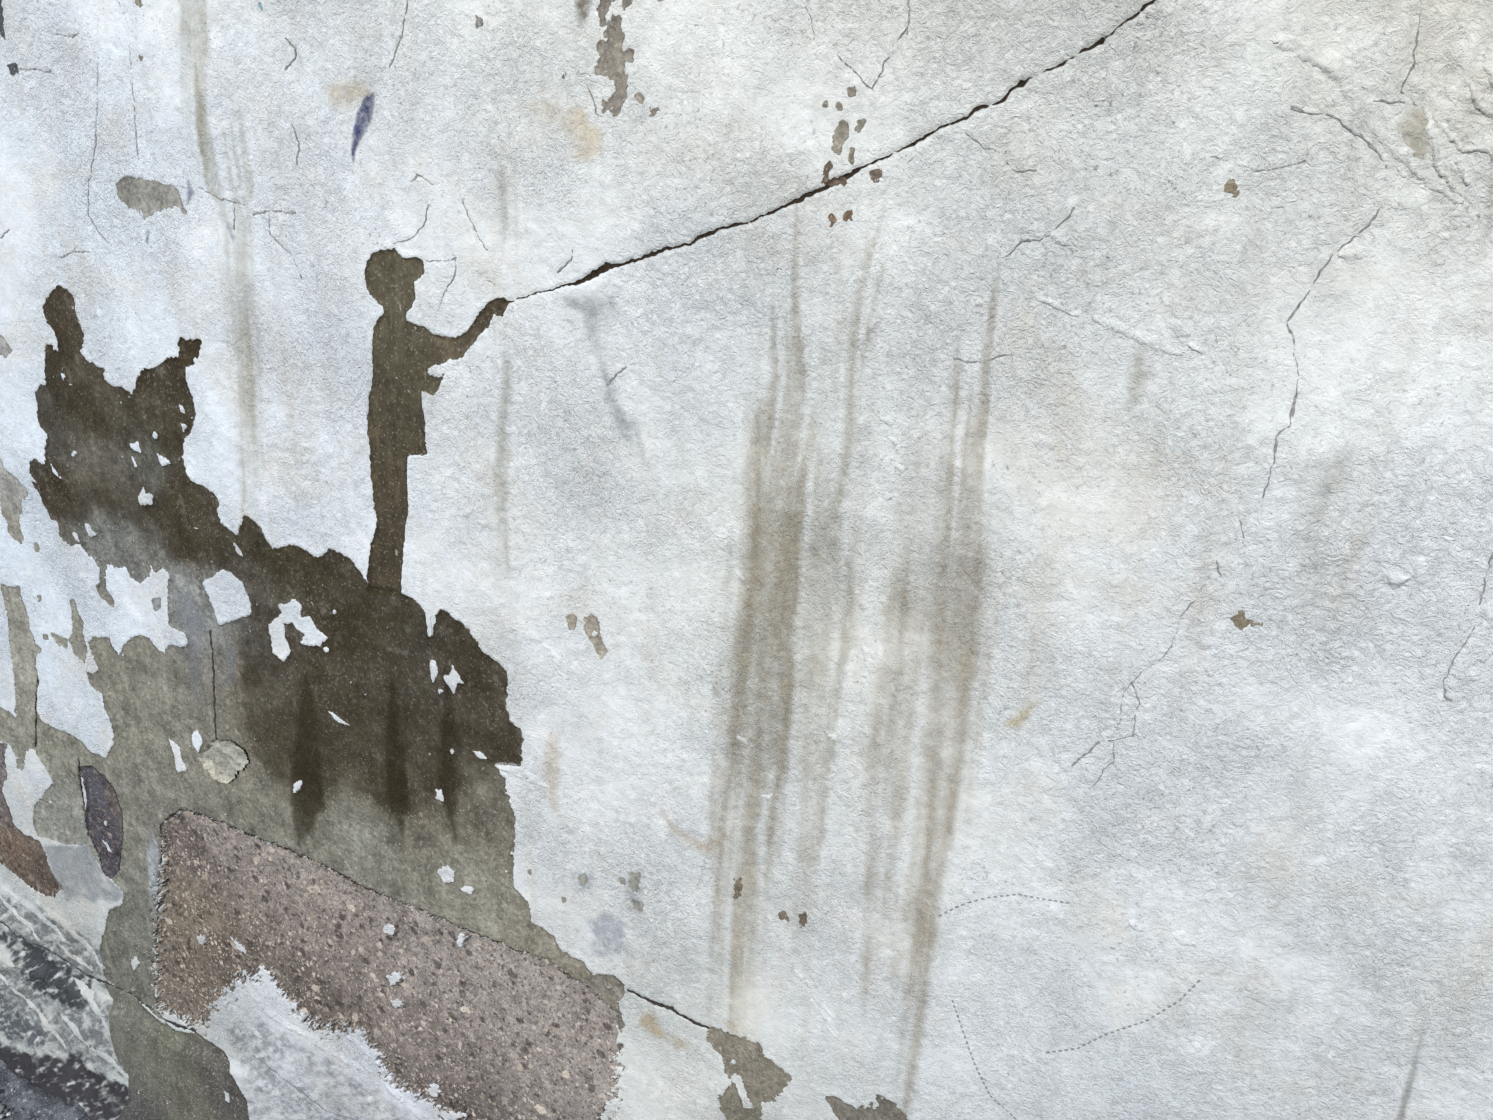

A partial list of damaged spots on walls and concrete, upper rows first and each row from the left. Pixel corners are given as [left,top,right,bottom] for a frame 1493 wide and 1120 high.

peeling [594,0,659,117]
crack [392,0,1155,303]
peeling [0,248,625,1120]
spalling [618,870,644,912]
peeling [706,1026,792,1120]
peeling [825,1094,907,1120]